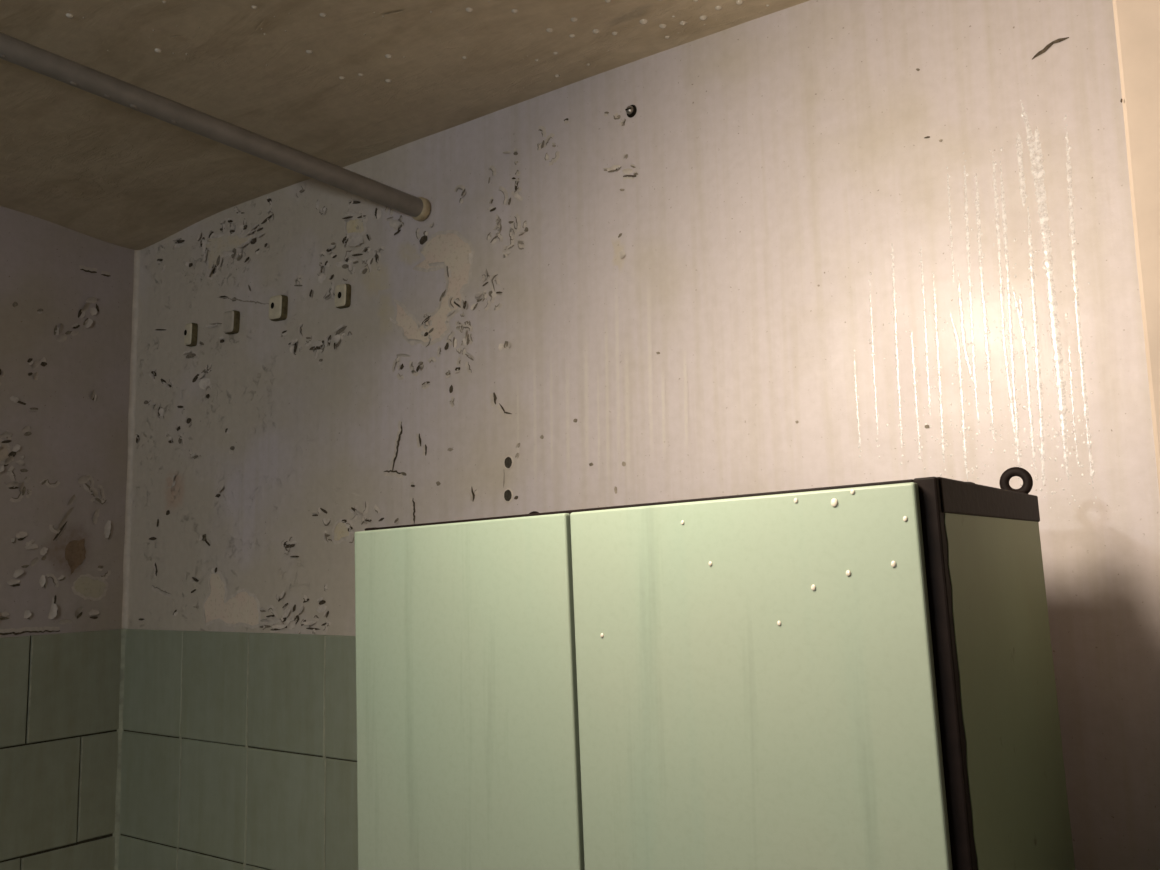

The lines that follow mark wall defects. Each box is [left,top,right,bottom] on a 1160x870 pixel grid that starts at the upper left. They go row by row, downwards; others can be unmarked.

crack [1032,37,1069,59]
peeling [487,148,528,258]
peeling [280,323,352,365]
peeling [294,198,503,407]
water stain [868,100,1097,518]
peeling [6,475,112,624]
peeling [190,567,331,634]